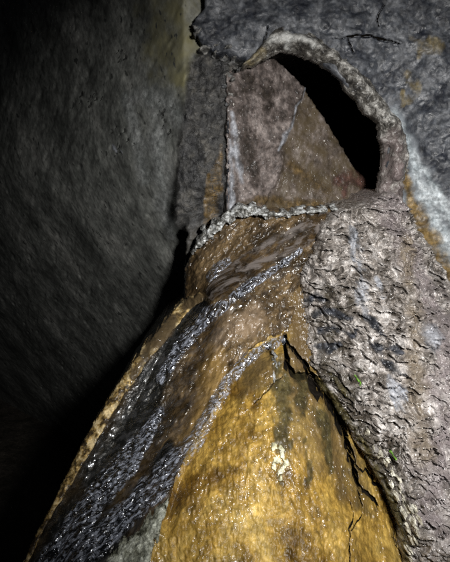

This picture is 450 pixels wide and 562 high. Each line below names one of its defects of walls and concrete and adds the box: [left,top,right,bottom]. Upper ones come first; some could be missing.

crack [335,5,400,53]
efflorescence [402,124,450,262]
efflorescence [268,342,281,383]
water stain [294,371,308,415]
efflorescence [271,442,289,481]
crack [254,334,383,562]
efflorescence [105,497,169,562]